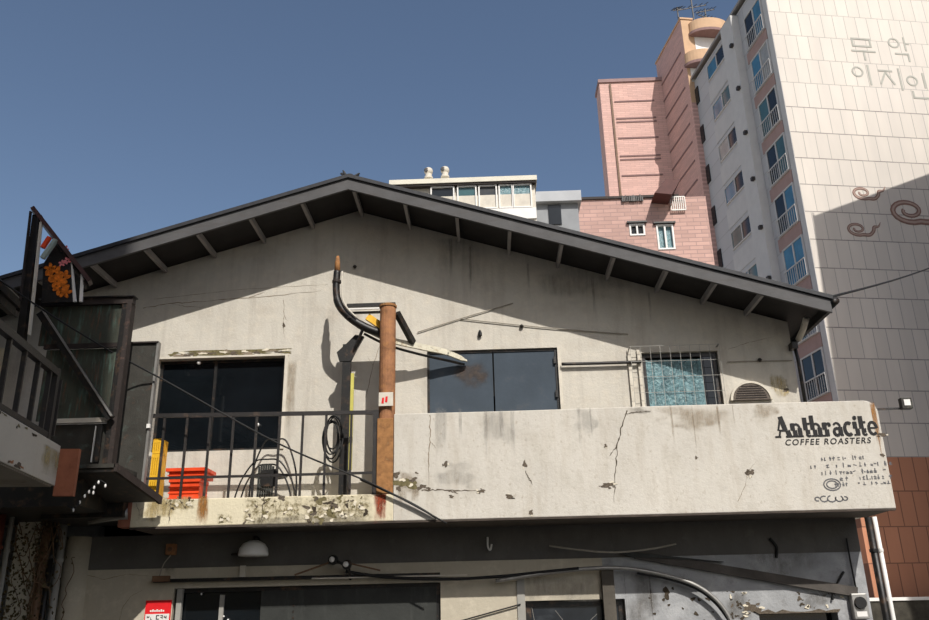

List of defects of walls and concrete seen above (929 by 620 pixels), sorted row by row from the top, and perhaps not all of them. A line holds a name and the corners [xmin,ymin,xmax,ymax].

crack [143,284,328,333]
crack [610,410,650,493]
peeling [393,472,431,491]
peeling [243,495,369,525]
corrosion [375,494,386,513]
spalling [726,591,765,620]